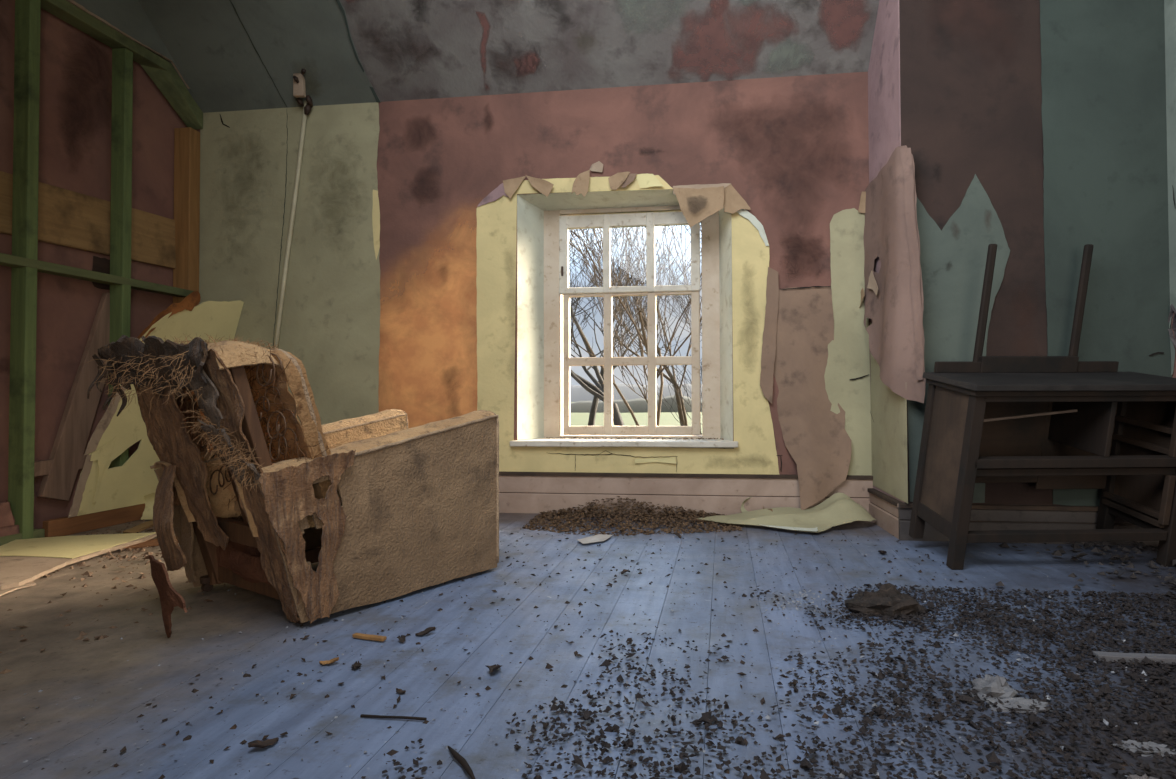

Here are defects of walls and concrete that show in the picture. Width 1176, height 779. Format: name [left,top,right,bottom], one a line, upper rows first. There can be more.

peeling [859,271,878,308]